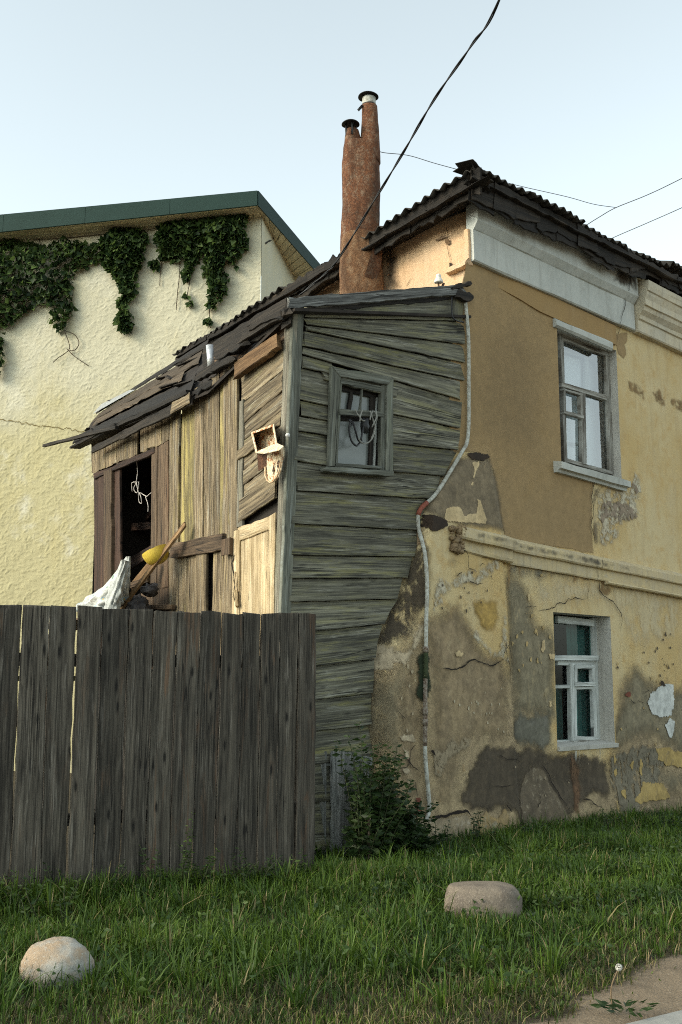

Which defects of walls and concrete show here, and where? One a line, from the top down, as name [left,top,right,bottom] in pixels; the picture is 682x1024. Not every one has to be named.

peeling [414,499,487,545]
crack [528,483,622,629]
peeling [593,474,641,545]
crack [446,637,512,676]
leakage [368,547,682,835]